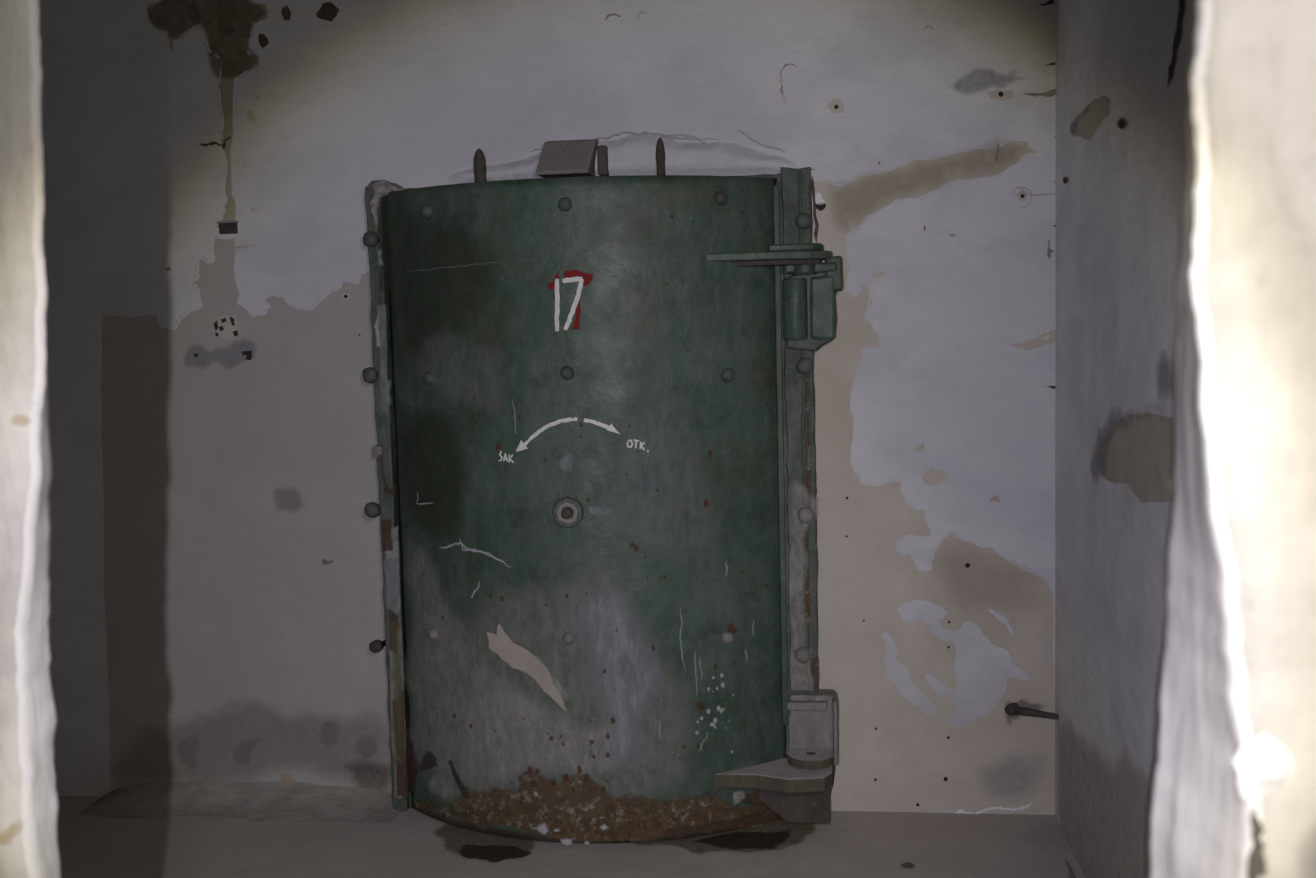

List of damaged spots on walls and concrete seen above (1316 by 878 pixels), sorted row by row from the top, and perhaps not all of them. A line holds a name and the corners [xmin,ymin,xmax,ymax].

peeling [101,0,392,794]
peeling [811,138,1056,814]
peeling [1054,95,1110,140]
peeling [1092,413,1173,503]